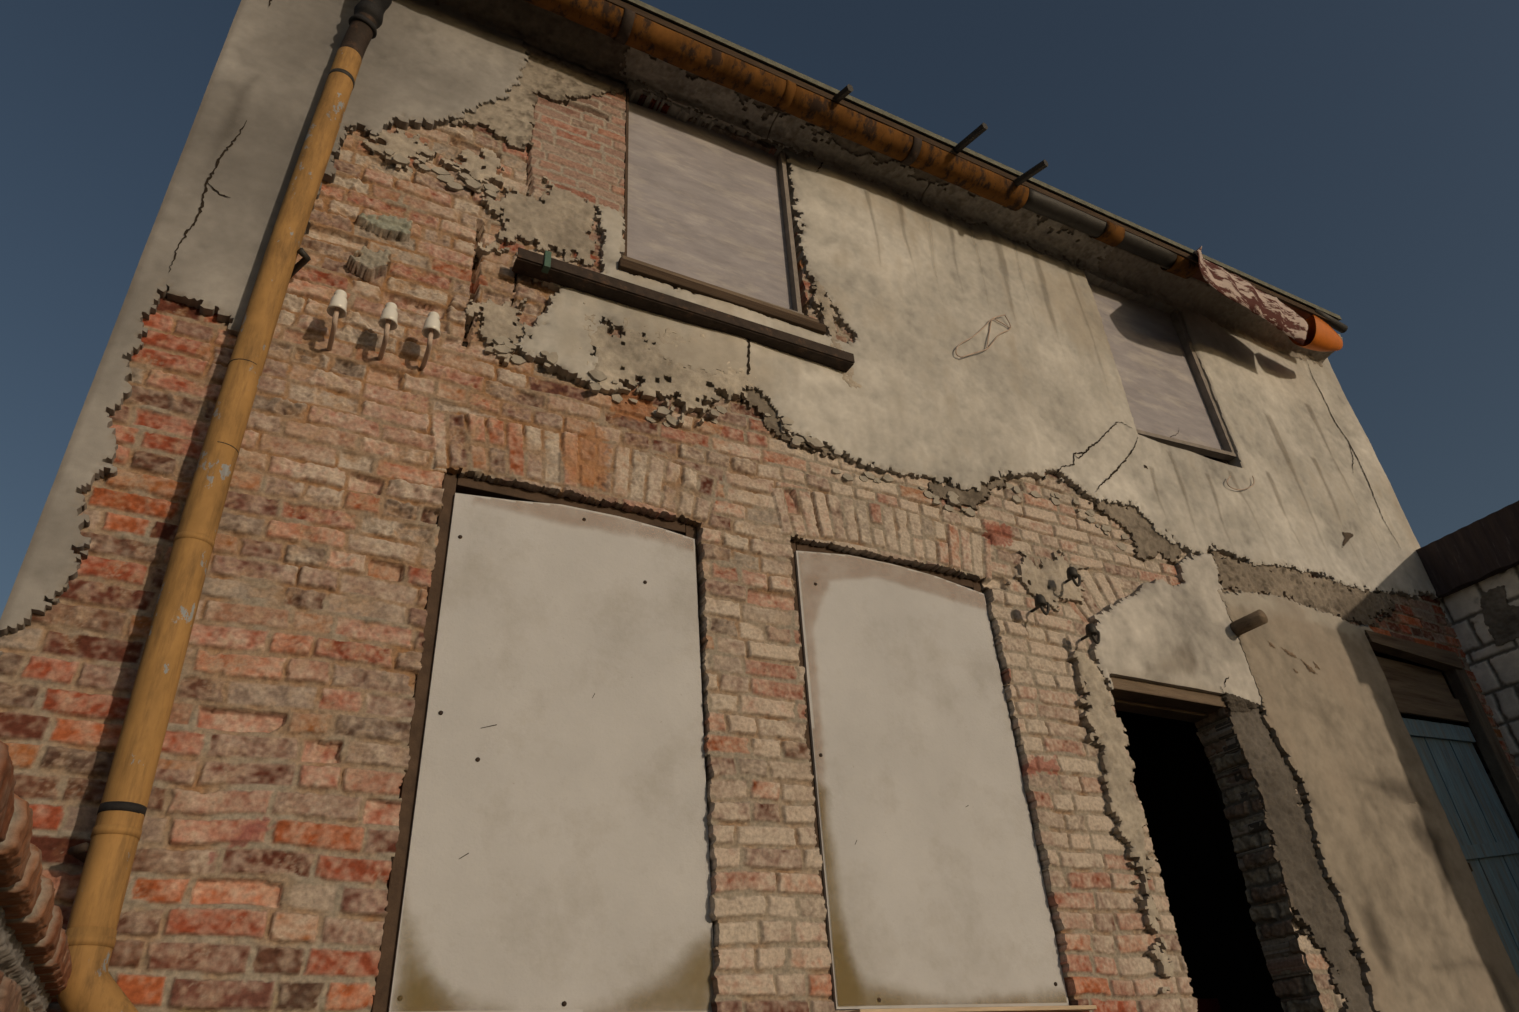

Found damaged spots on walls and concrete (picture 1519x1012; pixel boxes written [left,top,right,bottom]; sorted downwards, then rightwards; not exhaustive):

crack [169,120,247,272]
flaking render [362,128,600,267]
flaking render [619,47,1114,273]
flaking render [465,298,558,369]
flaking render [573,302,894,484]
flaking render [809,280,844,351]
flaking render [1006,549,1090,612]
flaking render [919,477,1181,565]
crack [1053,422,1179,489]
flaking render [1208,551,1396,628]
flaking render [1068,651,1175,994]
flaking render [1215,692,1373,1012]